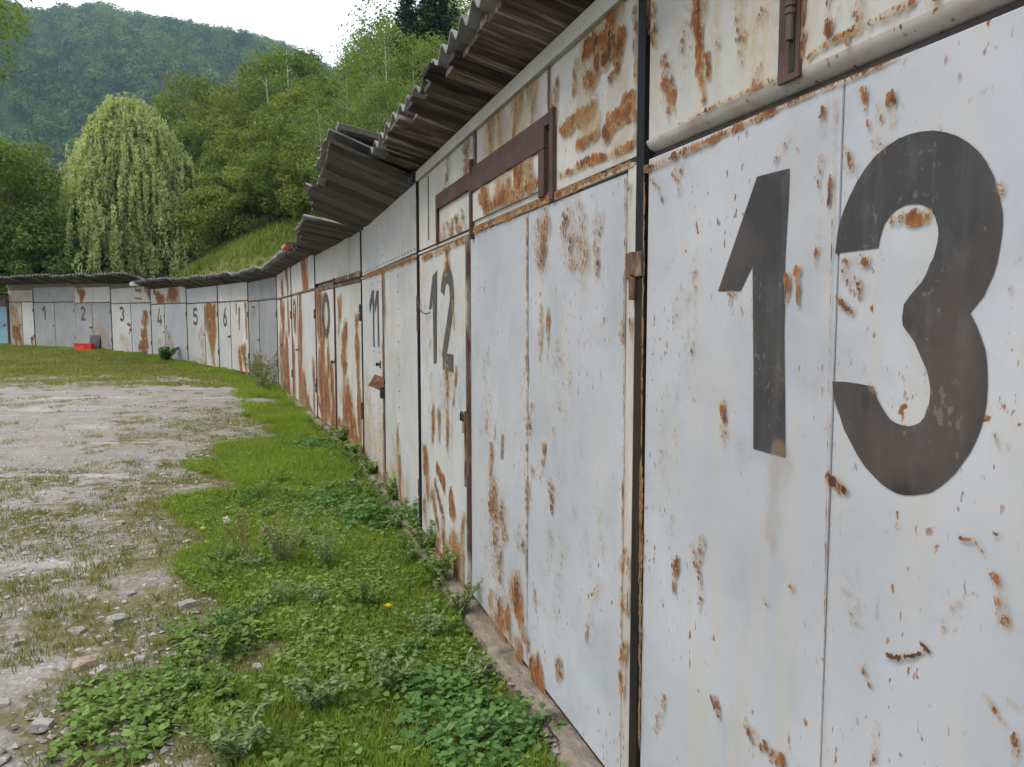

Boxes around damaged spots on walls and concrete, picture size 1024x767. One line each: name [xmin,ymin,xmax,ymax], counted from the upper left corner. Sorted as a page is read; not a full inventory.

rust [678,0,774,118]
rust [643,57,897,216]
rust [889,208,932,227]
rust [118,287,180,353]
rust [204,303,216,368]
rust [279,258,363,456]
rust [359,2,637,696]
rust [825,471,848,574]
rust [618,464,643,696]
rust [989,571,1010,627]
rust [886,642,930,662]
rust [743,718,785,767]